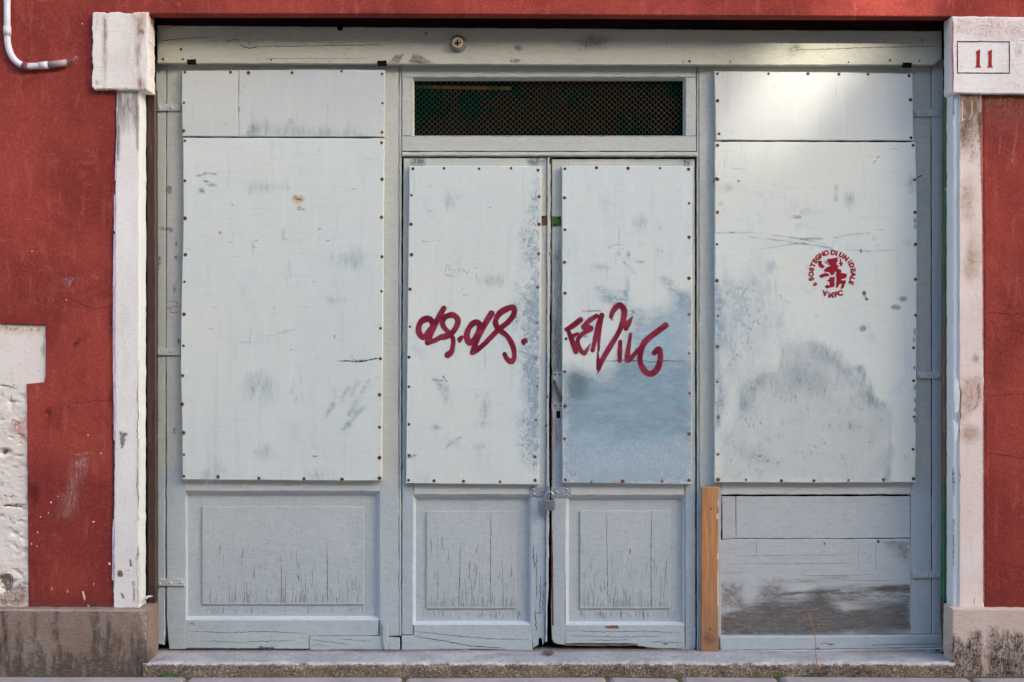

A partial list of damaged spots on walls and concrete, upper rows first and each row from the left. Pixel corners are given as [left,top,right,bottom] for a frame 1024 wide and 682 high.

water stain [951,630,1024,677]